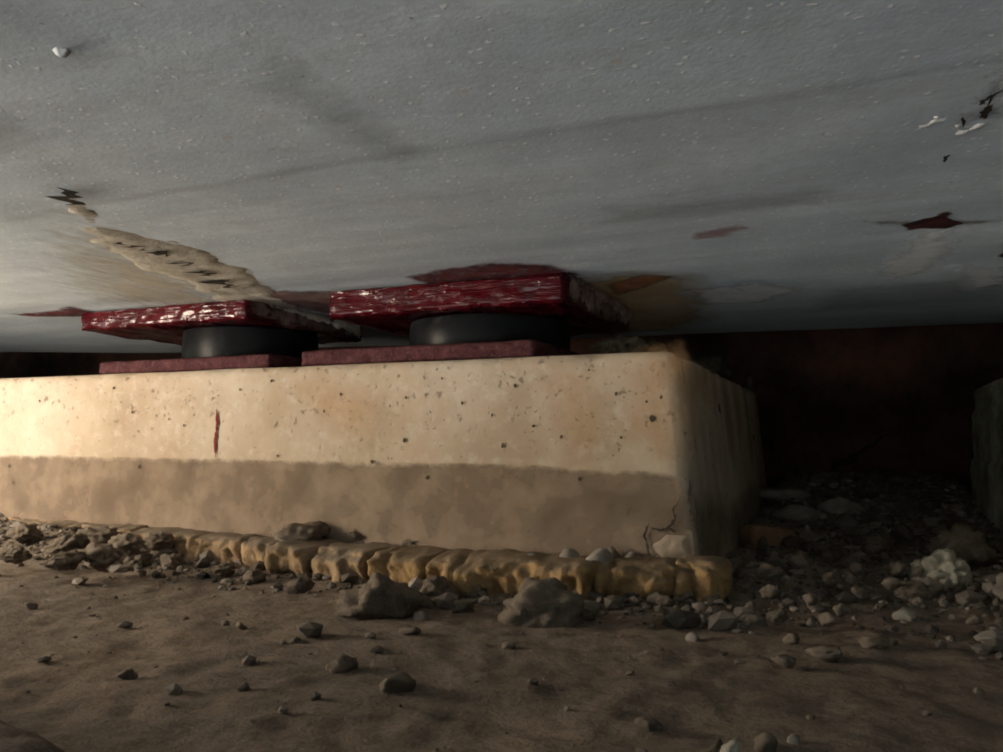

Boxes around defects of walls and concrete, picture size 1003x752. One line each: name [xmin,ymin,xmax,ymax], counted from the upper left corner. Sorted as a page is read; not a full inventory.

crack [915,90,1003,162]
peeling [46,187,296,308]
corrosion [903,212,982,230]
damp [0,409,686,558]
crack [643,480,696,558]